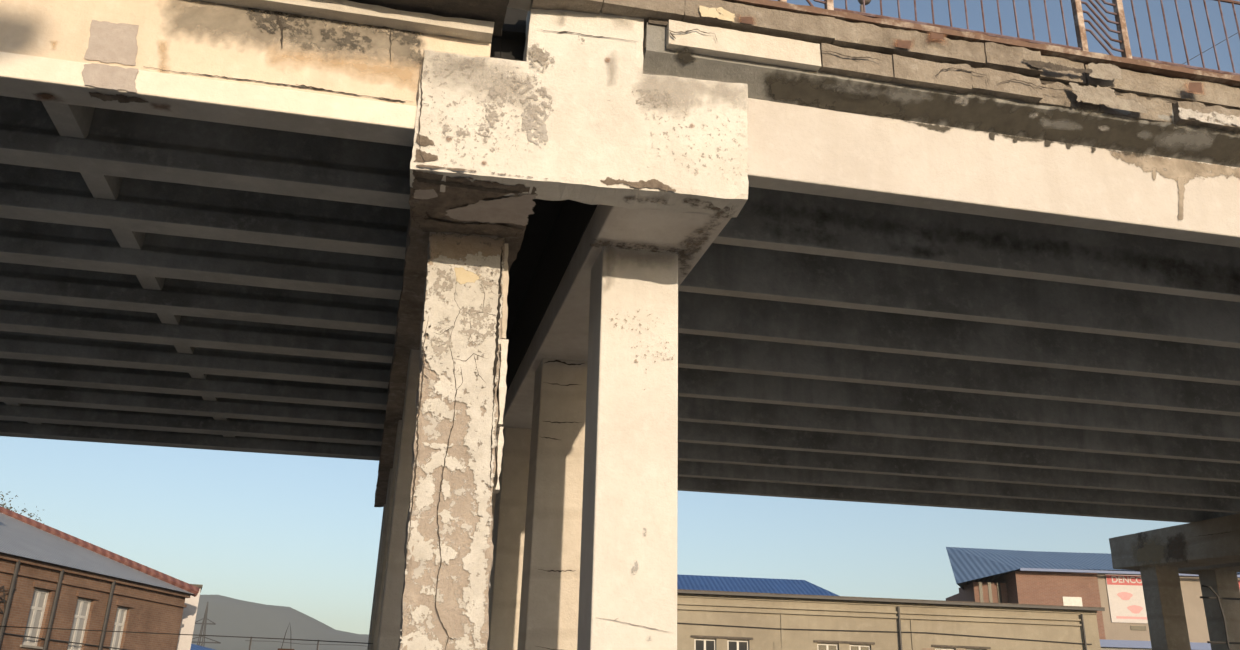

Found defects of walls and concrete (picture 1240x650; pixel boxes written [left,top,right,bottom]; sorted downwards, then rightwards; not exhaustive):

damp [172,2,422,81]
damp [676,48,695,64]
rust [895,40,912,49]
spalling [1023,59,1147,113]
rust [1186,82,1204,94]
peeling [652,114,736,171]
damp [766,73,1240,220]
spalling [1178,107,1240,127]
spalling [600,177,676,192]
peeling [400,43,555,650]
crack [407,250,503,650]